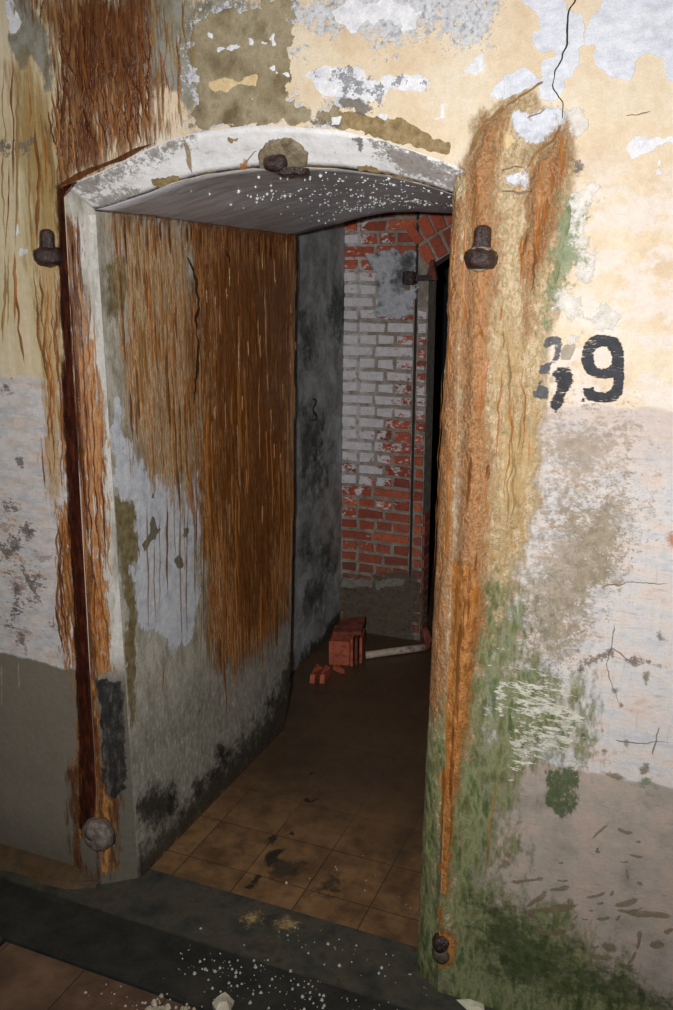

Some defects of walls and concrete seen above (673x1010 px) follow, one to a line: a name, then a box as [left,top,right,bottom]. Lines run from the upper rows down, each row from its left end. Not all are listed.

flaking render [151,175,179,188]
peeling [145,0,509,155]
crack [470,0,576,195]
peeling [490,0,673,102]
water stain [328,289,345,340]
water stain [95,495,140,798]
rust [13,0,297,878]
peeling [110,396,203,652]
water stain [136,533,424,877]
rust [429,107,569,969]
crack [606,628,626,701]
crack [604,580,666,588]